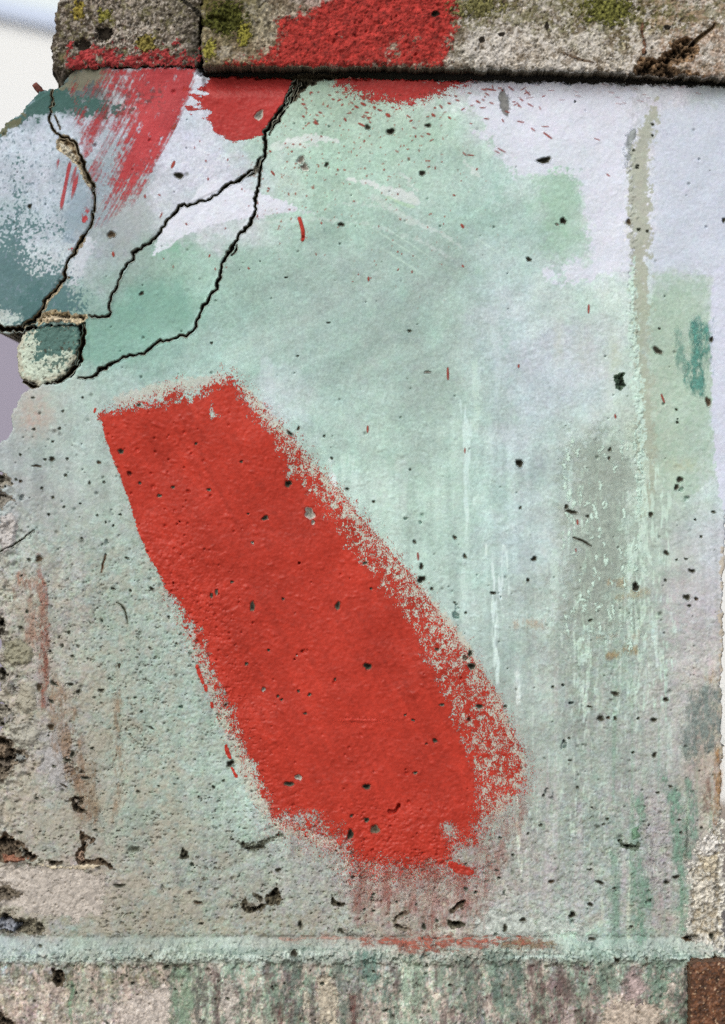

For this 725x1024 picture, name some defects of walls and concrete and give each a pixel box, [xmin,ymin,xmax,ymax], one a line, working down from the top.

crack [0,89,97,333]
spalling [37,286,88,326]
crack [22,79,302,389]